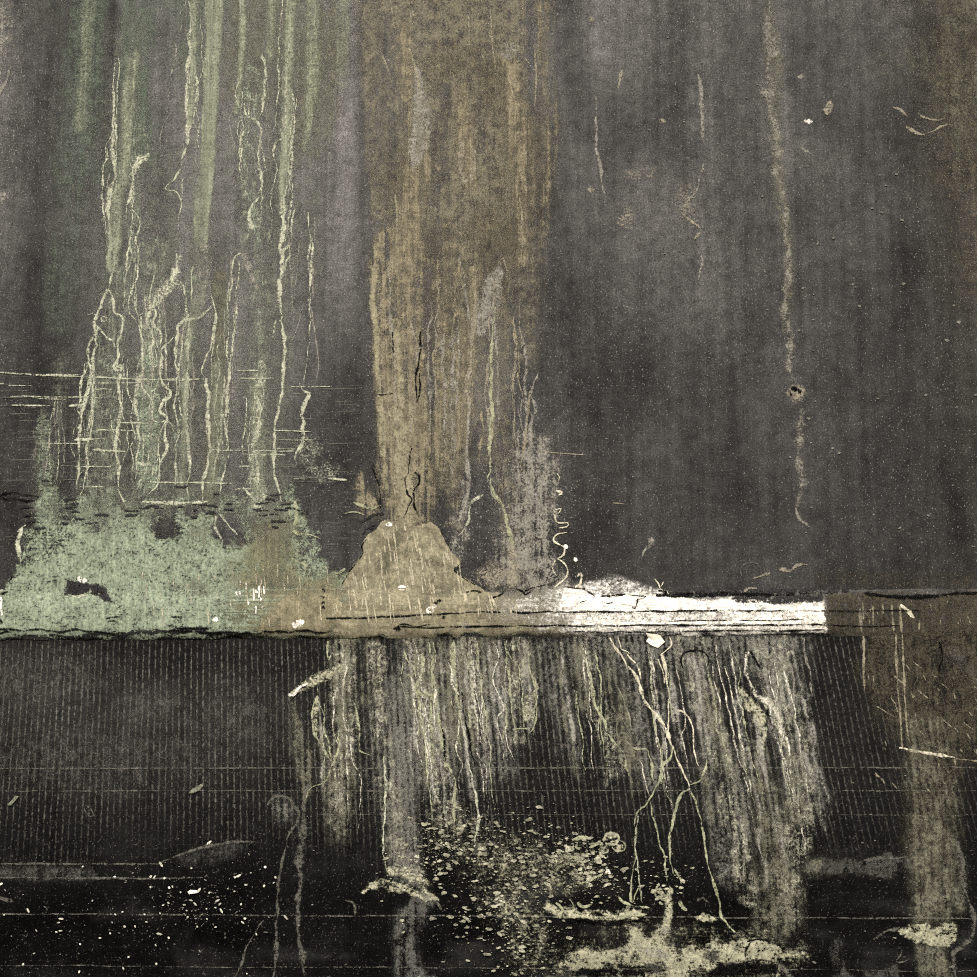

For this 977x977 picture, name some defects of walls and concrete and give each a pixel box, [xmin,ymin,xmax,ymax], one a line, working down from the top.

damp [36,0,348,526]
damp [588,98,605,194]
damp [679,164,704,280]
damp [762,2,794,379]
damp [288,298,977,977]